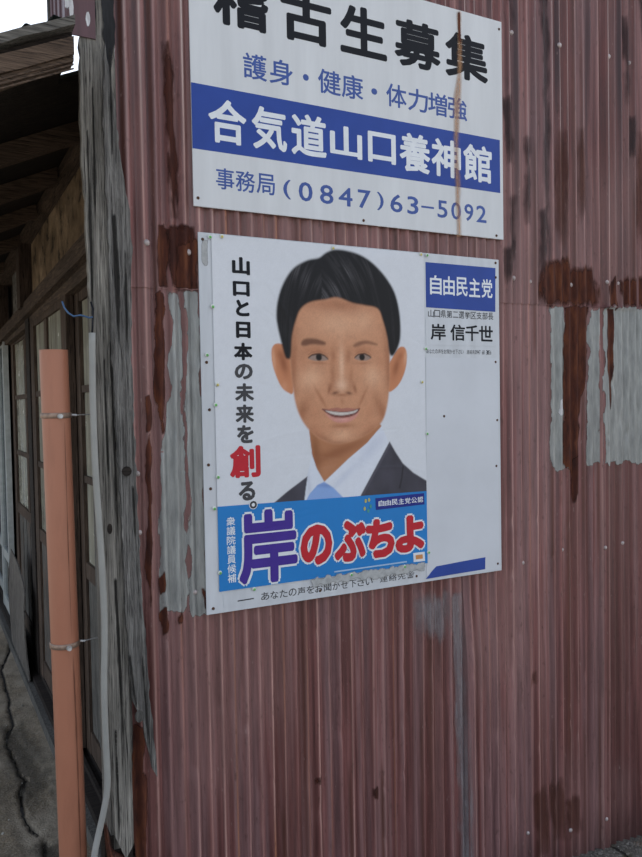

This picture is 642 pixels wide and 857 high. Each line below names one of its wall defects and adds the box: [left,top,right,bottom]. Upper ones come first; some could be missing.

peeling [158,290,206,617]
peeling [549,306,568,472]
corrosion [539,257,642,502]
peeling [586,306,642,466]
crack [0,648,46,857]